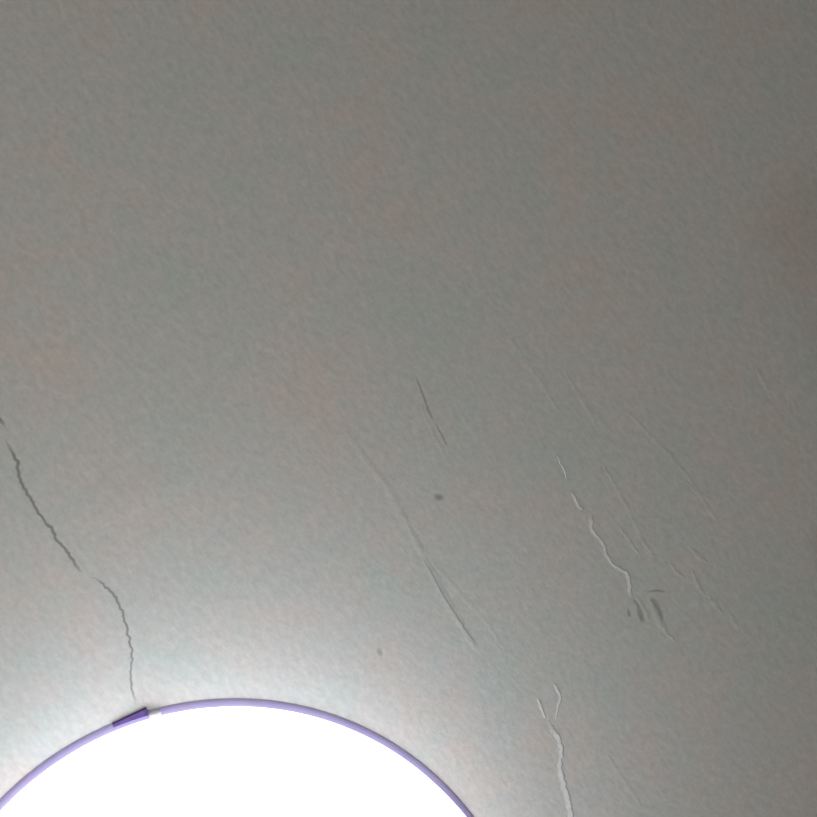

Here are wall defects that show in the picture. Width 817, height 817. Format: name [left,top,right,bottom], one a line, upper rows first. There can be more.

crack [557,456,675,642]
crack [537,684,574,817]